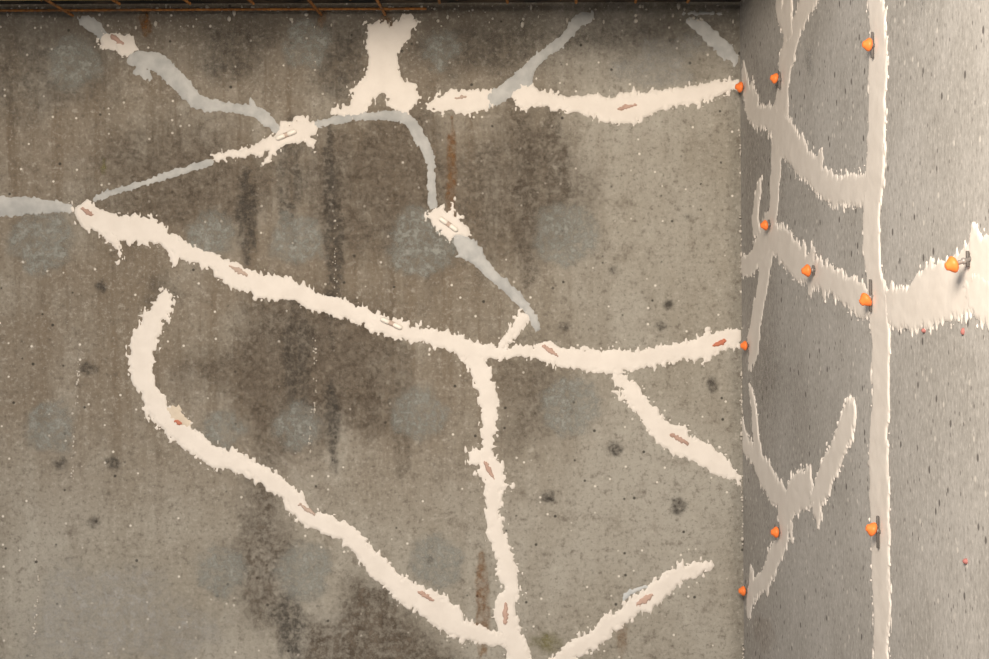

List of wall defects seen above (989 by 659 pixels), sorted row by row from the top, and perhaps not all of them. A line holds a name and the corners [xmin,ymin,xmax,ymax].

leakage [104,135,269,263]
leakage [311,124,443,264]
leakage [464,111,575,241]
leakage [203,299,387,462]
crack [0,10,742,659]
crack [421,0,989,659]
leakage [241,482,450,659]